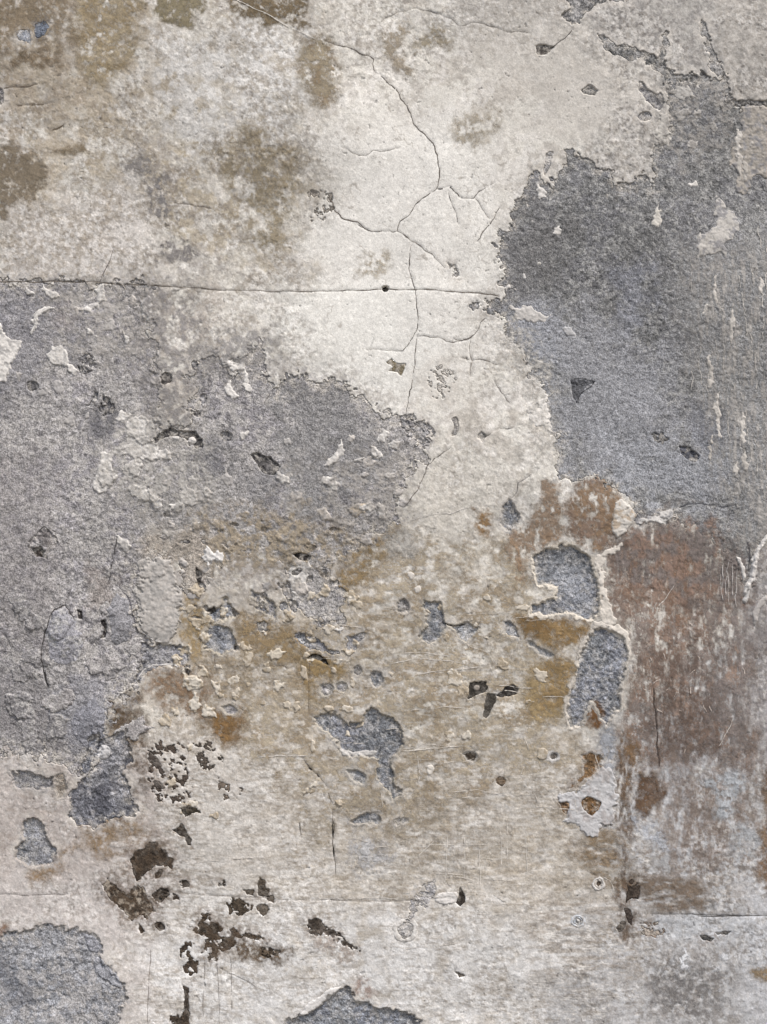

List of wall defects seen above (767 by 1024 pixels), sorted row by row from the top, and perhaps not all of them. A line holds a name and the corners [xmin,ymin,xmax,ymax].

peeling [536,45,553,55]
crack [0,251,217,290]
crack [326,41,513,437]
flaking render [469,70,767,730]
flaking render [0,275,435,830]
water stain [147,528,590,879]
flaking render [444,730,477,764]
flaking render [447,668,534,718]
corrosion [505,476,767,940]
flaking render [13,817,57,868]
flaking render [0,923,129,1024]
flaking render [285,985,422,1024]